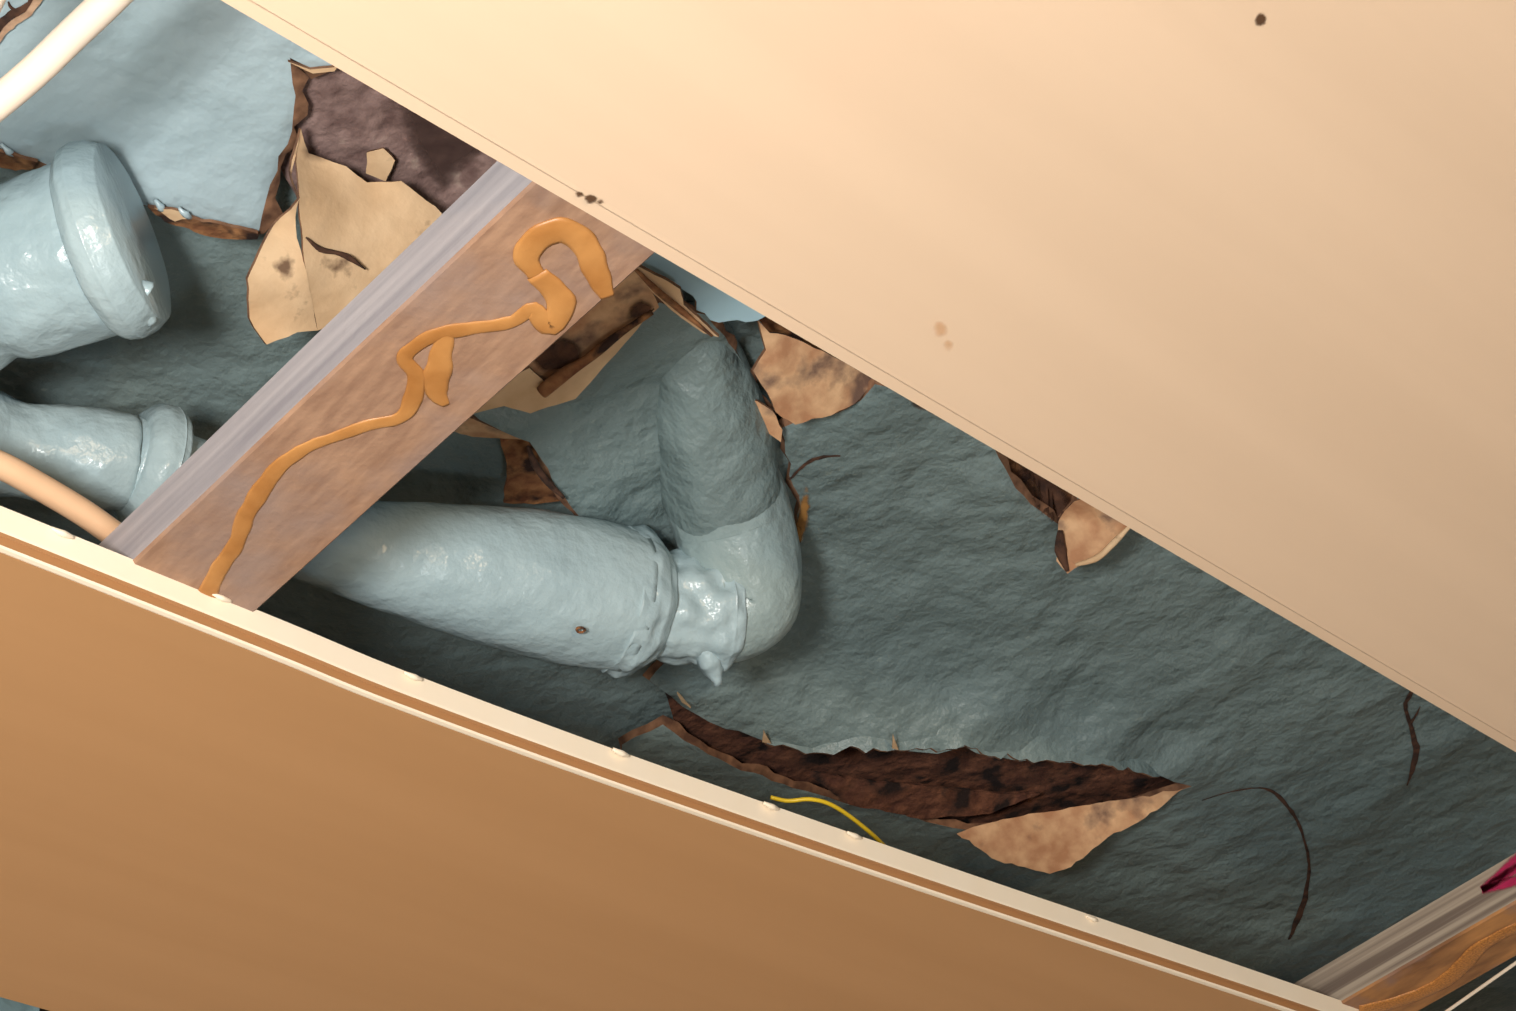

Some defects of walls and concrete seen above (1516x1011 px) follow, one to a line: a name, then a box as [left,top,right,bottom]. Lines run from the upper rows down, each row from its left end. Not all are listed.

peeling [454,253,1516,984]
crack [1403,691,1420,786]
crack [1202,787,1311,940]
peeling [1419,956,1516,1011]